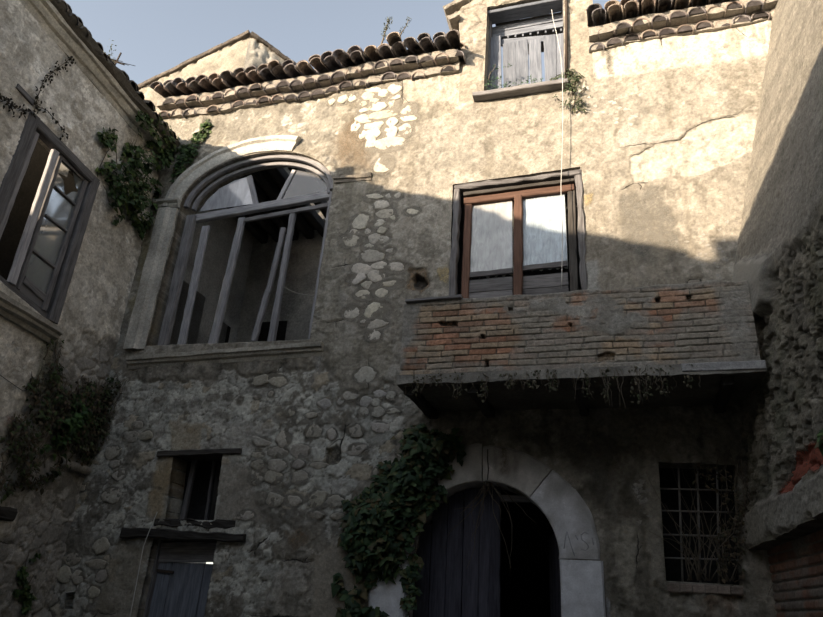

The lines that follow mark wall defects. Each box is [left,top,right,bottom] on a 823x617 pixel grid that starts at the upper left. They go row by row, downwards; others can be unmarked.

flaking render [326,81,420,176]
crack [620,110,743,156]
flaking render [338,189,430,343]
flaking render [247,366,402,521]